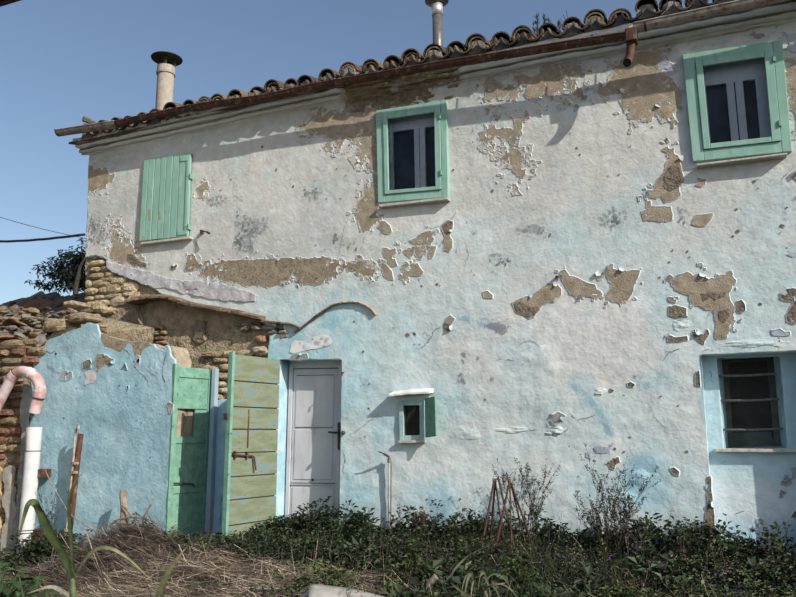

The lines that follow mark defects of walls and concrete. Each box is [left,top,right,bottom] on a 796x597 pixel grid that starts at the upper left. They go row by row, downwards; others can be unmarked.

peeling [467,43,689,197]
peeling [749,24,796,141]
peeling [87,158,116,197]
peeling [170,100,454,289]
peeling [637,138,708,223]
peeling [507,263,643,320]
peeling [659,262,746,345]
peeling [770,287,796,342]
peeling [60,334,150,389]